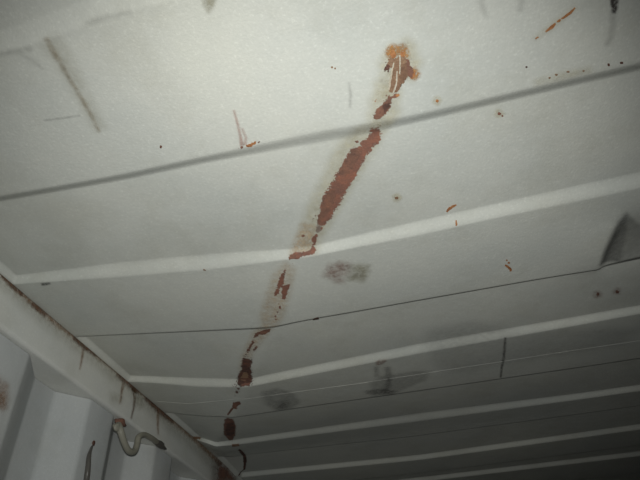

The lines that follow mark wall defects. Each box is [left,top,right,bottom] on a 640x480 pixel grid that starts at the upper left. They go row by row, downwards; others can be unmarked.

rust [2,276,62,327]
rust [101,359,234,480]